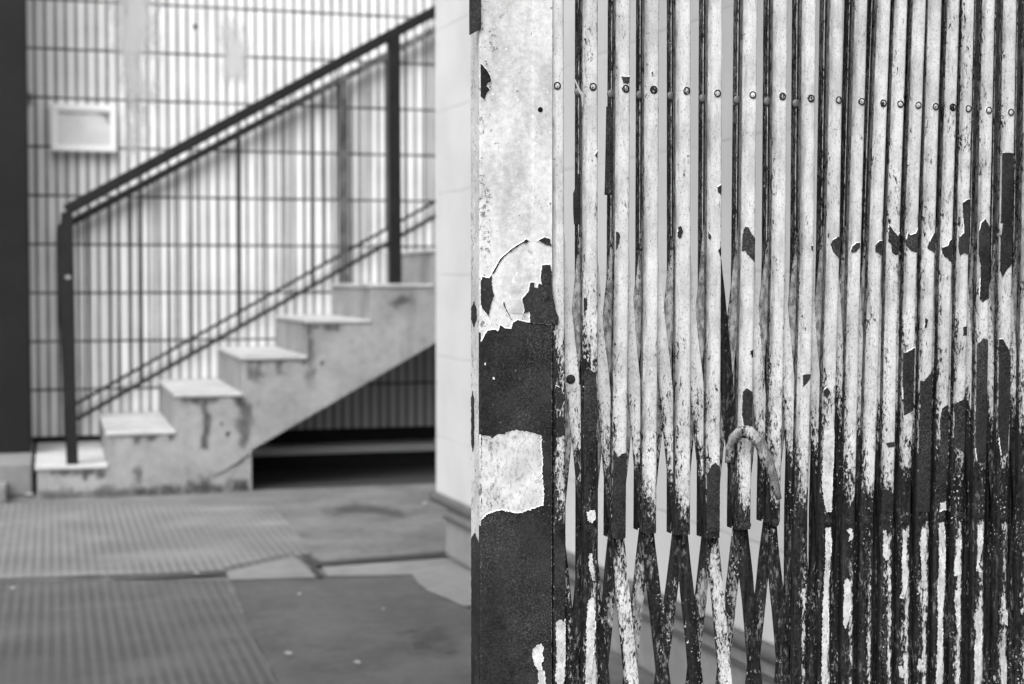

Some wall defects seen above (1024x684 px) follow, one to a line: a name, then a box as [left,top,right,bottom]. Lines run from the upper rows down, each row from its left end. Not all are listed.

peeling [480,63,492,101]
peeling [471,236,566,684]